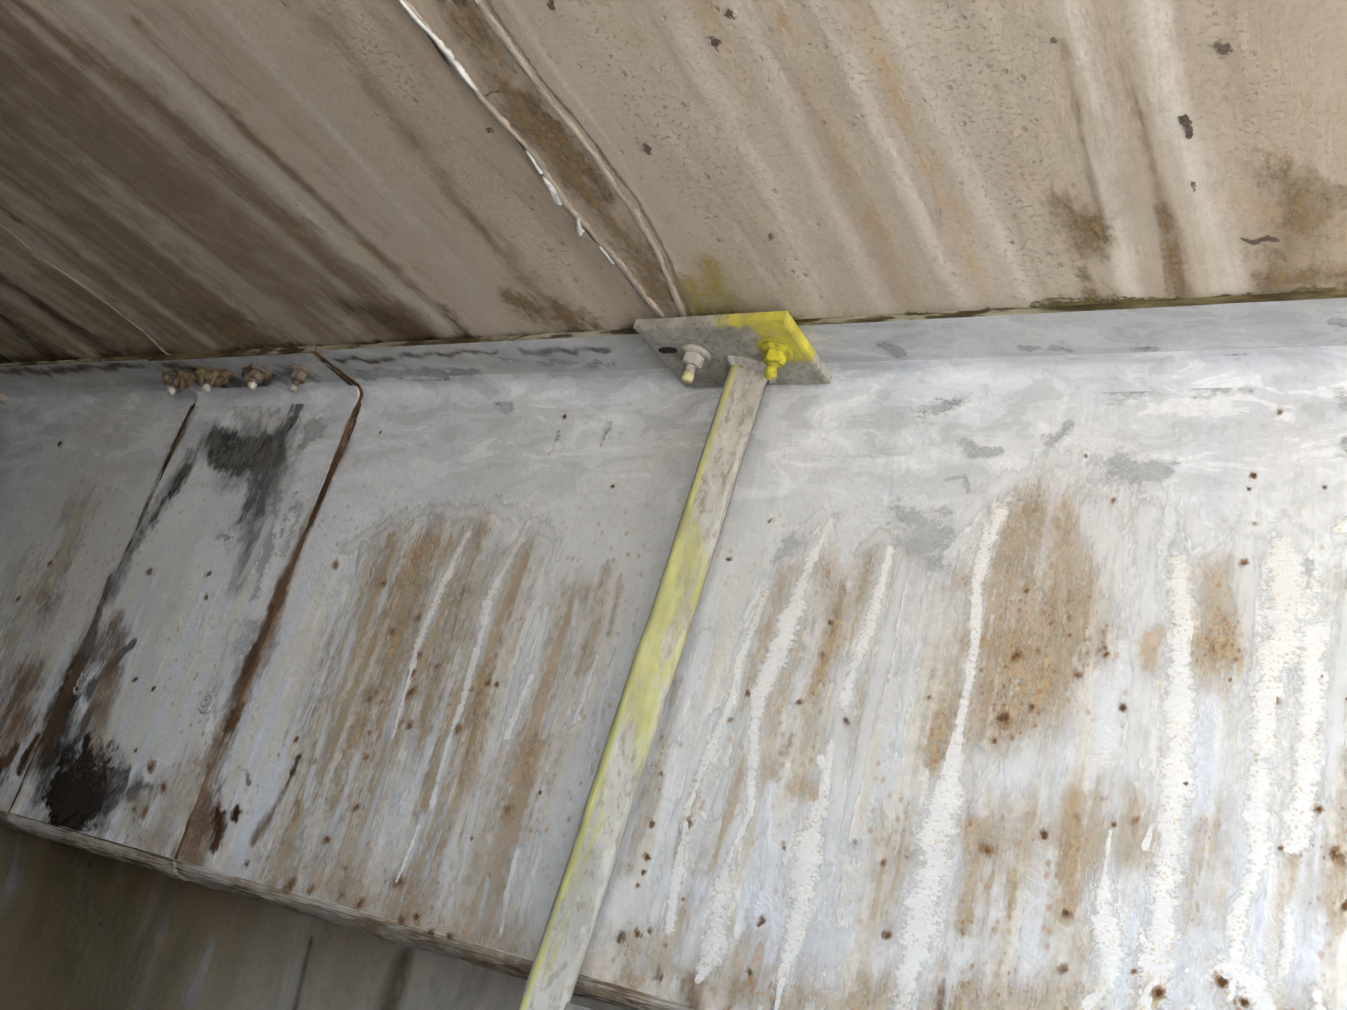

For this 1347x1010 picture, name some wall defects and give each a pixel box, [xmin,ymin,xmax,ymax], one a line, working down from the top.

crack [399,0,692,318]
corrosion [0,584,58,784]
leakage [32,404,324,1010]
corrosion [129,402,361,866]
corrosion [244,513,623,952]
leakage [649,507,837,985]
leakage [772,529,907,1010]
leakage [891,452,1070,1010]
corrosion [918,484,1111,773]
corrosion [1148,986,1165,1009]
leakage [1078,457,1347,1010]
corrosion [1214,971,1228,988]